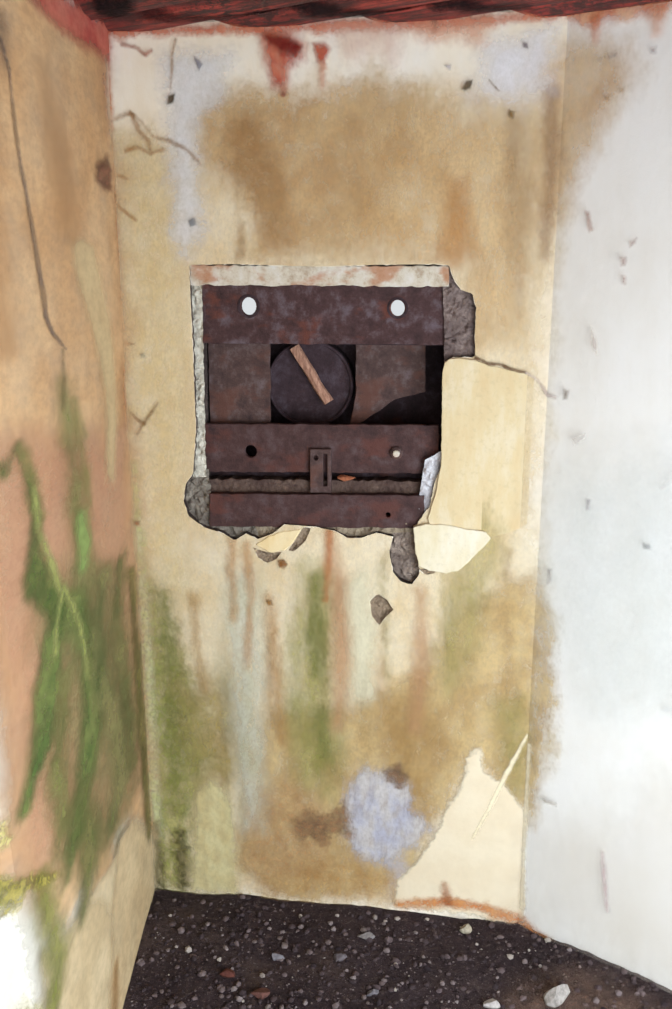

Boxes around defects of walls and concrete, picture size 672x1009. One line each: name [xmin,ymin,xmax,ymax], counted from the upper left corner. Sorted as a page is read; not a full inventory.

crack [0,39,64,346]
corrosion [39,0,669,113]
leakage [548,49,617,204]
crack [474,357,526,373]
leakage [0,0,557,922]
peeling [324,451,491,582]
peeling [295,737,530,925]
peeling [0,912,34,1009]
peeling [43,821,155,1009]